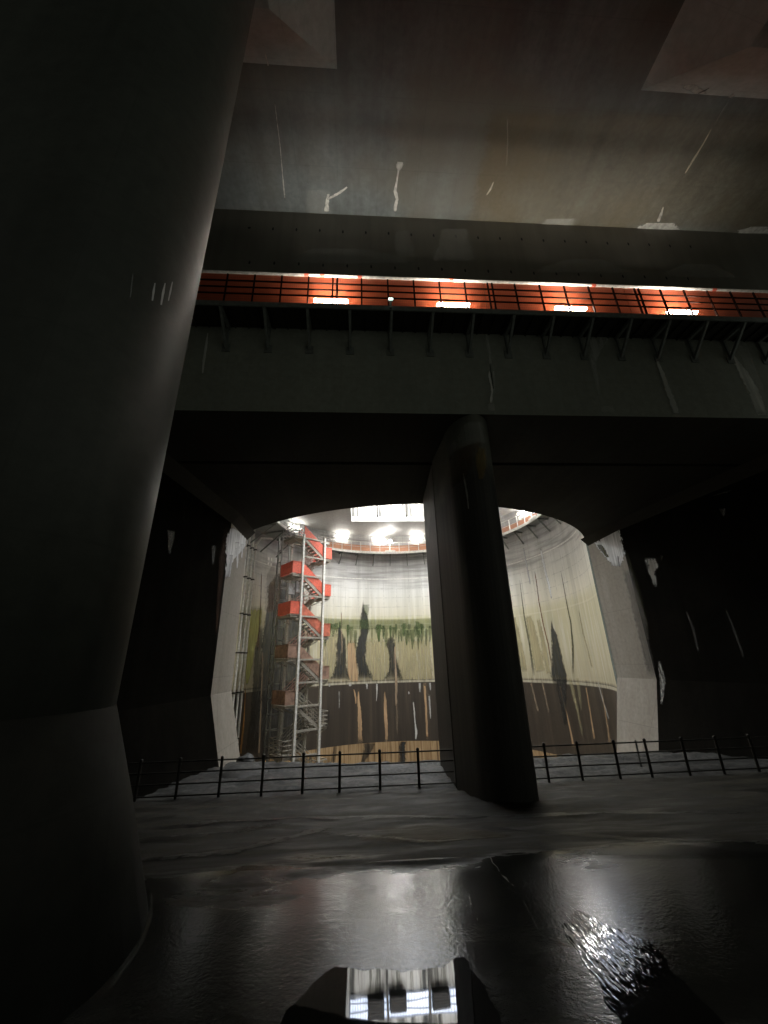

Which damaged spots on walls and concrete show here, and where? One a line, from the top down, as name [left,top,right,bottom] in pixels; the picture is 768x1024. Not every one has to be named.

crack [275,108,285,195]
damp [324,187,347,211]
damp [394,163,402,211]
peeling [595,531,625,566]